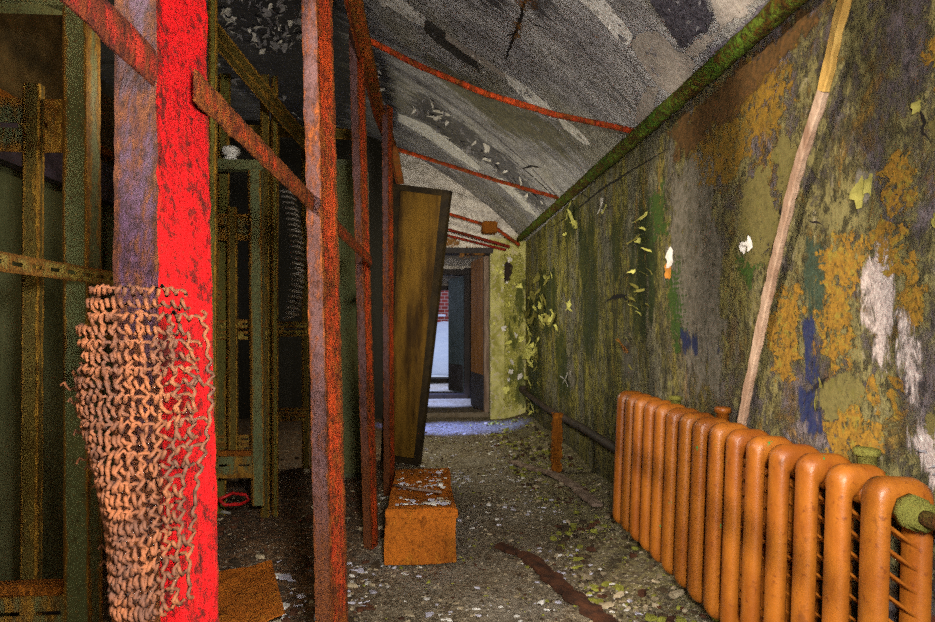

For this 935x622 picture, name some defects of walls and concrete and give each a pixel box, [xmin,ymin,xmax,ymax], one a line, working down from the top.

flaking render [605,0,767,124]
leakage [667,7,819,163]
peeling [919,36,935,67]
leakage [555,329,570,397]
leakage [579,221,599,362]
leakage [638,180,670,342]
leakage [681,329,722,359]
flaking render [620,47,799,400]
peeling [766,149,928,460]
leakage [860,237,923,405]
flaking render [907,412,935,490]